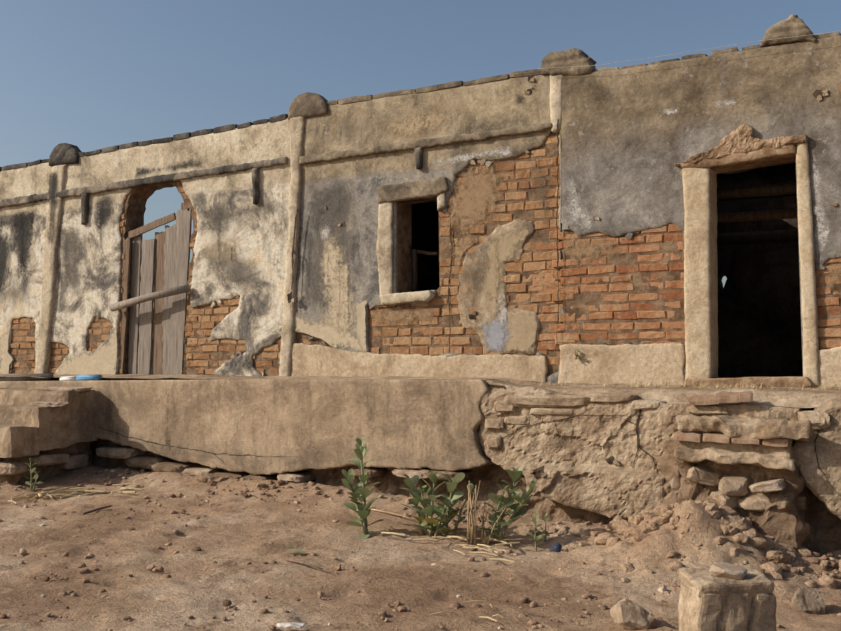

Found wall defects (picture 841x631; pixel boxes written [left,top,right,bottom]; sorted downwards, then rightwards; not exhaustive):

leakage [0,212,33,299]
peeling [120,187,137,244]
peeling [160,181,281,380]
leakage [213,259,257,286]
leakage [207,202,275,235]
leakage [306,182,351,305]
peeling [293,131,685,376]
peeling [815,258,841,350]
peeling [0,317,36,374]
crack [98,427,292,461]
crack [502,409,658,475]
crack [814,429,841,496]